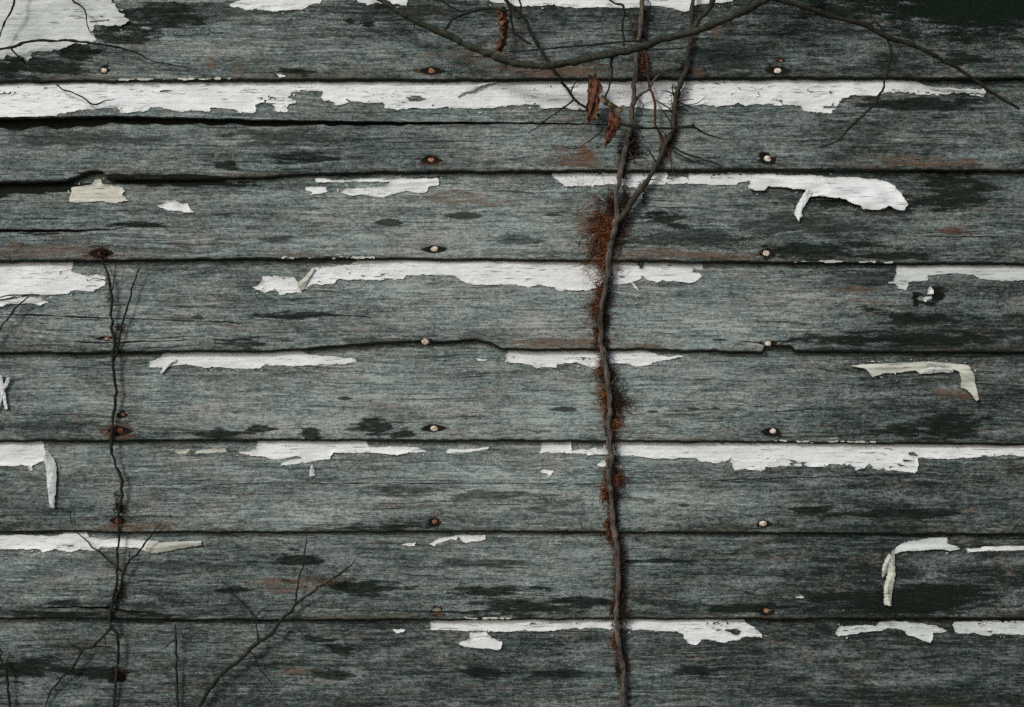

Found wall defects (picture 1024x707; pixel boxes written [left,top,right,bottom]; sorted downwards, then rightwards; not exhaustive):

peeling [0,0,129,61]
peeling [0,74,986,117]
peeling [552,172,908,221]
peeling [0,262,106,307]
peeling [253,256,703,295]
peeling [149,351,357,374]
peeling [175,440,426,476]
peeling [540,439,1024,473]
peeling [0,532,201,555]
peeling [882,537,1024,606]
peeling [426,617,766,650]
peeling [835,620,1024,643]